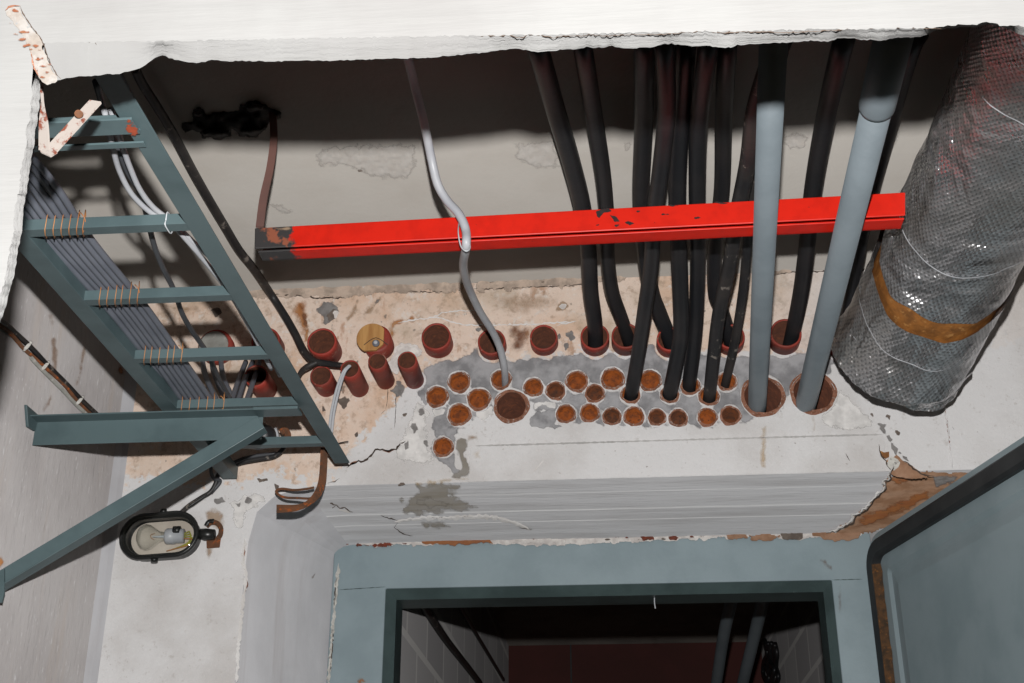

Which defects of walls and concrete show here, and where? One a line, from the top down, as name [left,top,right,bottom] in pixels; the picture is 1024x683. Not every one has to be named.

spalling [6,5,61,85]
spalling [316,302,339,325]
crack [329,392,405,513]
damp [400,437,473,528]
spalling [346,393,967,548]
rust [872,564,895,683]